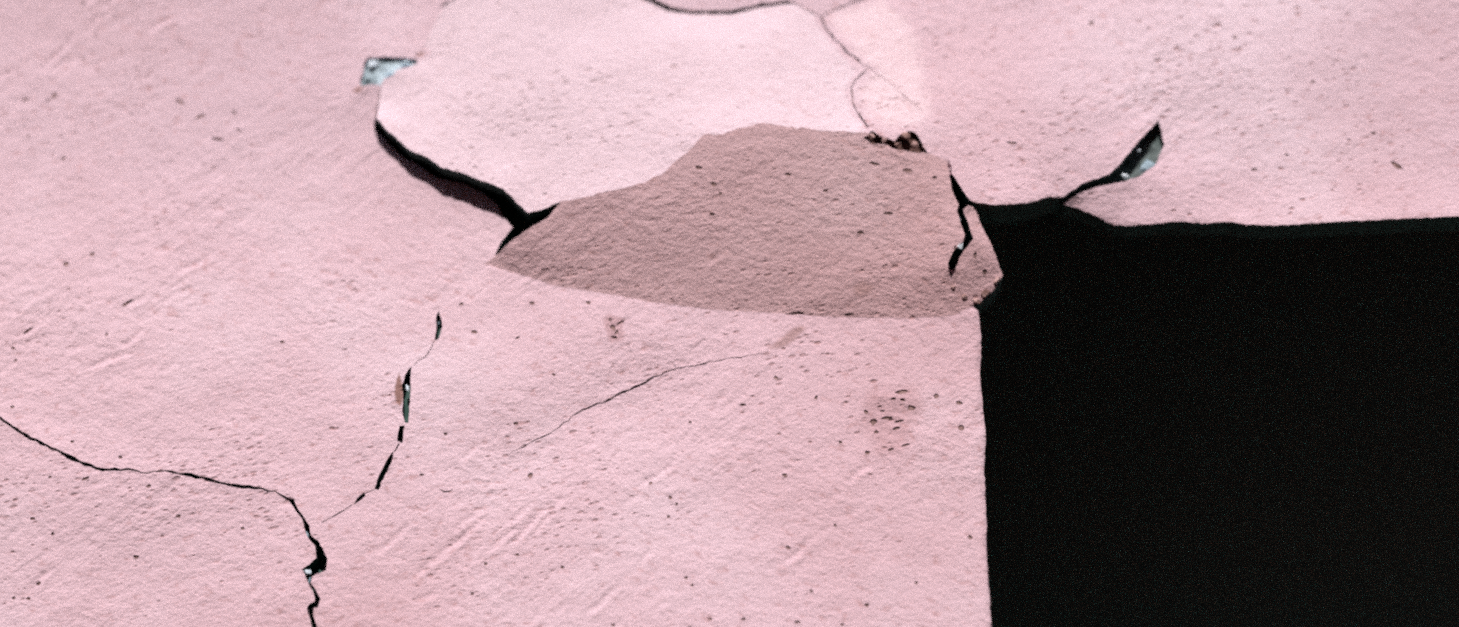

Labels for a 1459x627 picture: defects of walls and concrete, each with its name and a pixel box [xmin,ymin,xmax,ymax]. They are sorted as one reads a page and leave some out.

spalling [360,56,417,86]
crack [646,0,922,128]
spalling [864,131,928,172]
spalling [1061,121,1164,208]
crack [0,311,442,627]